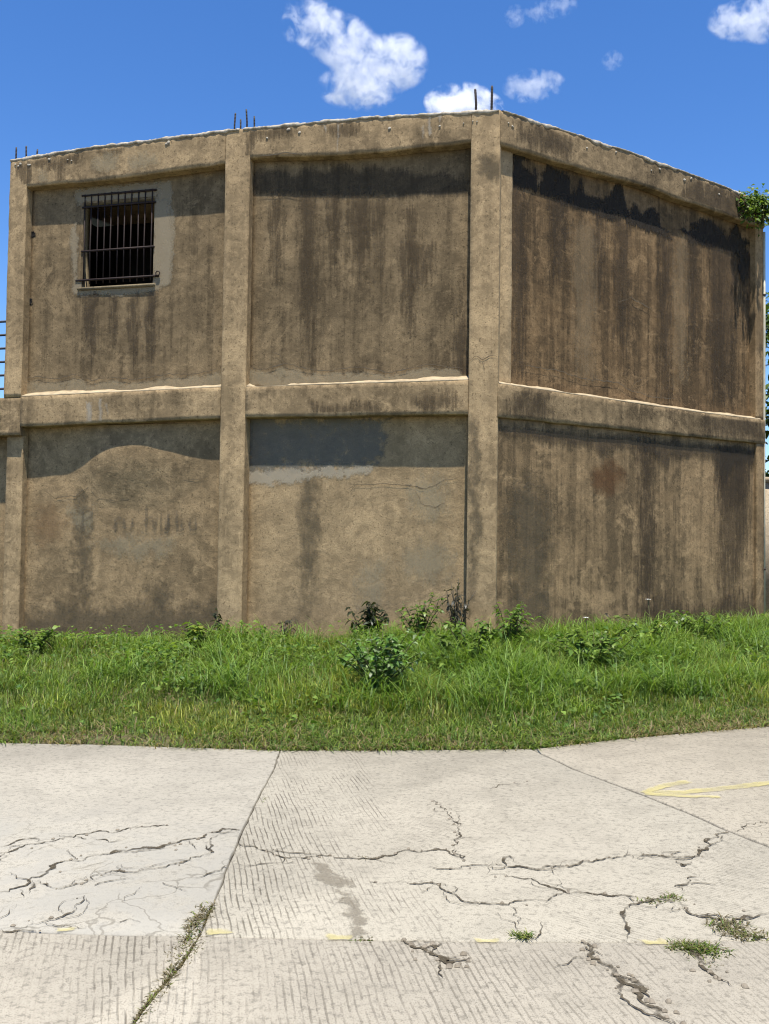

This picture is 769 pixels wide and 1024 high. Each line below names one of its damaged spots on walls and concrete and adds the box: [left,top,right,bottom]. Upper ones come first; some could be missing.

leakage [253,165,465,198]
leakage [512,154,750,283]
leakage [249,465,373,486]